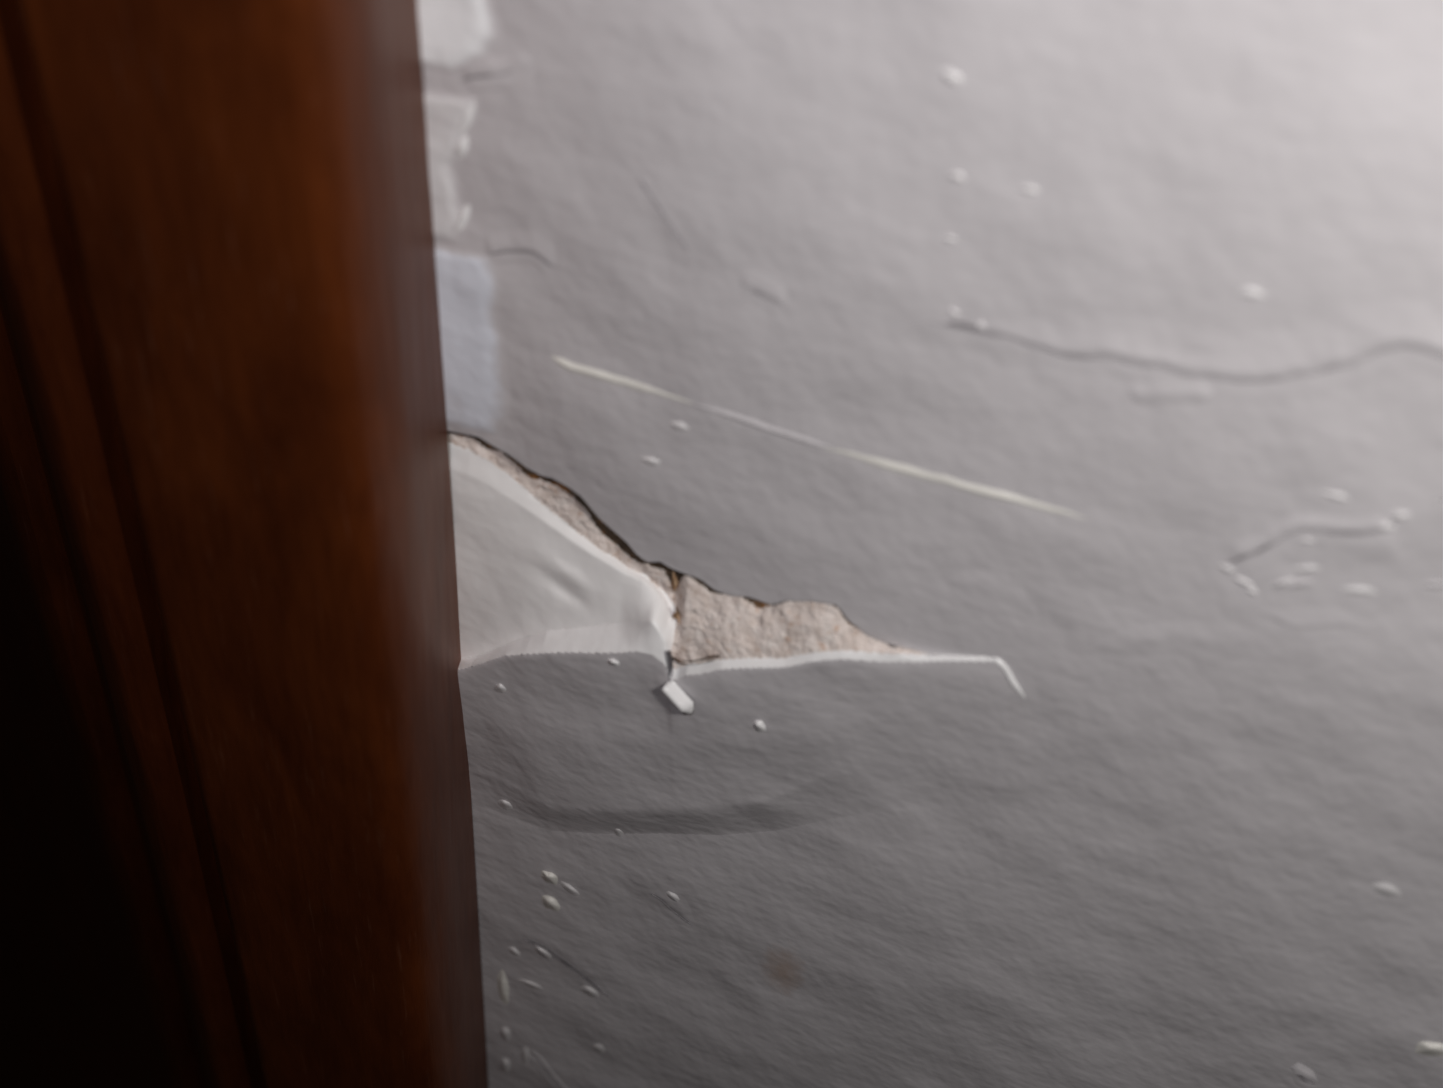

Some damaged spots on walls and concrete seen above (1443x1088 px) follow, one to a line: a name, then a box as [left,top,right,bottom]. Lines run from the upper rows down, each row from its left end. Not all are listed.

spalling [447,430,1026,715]